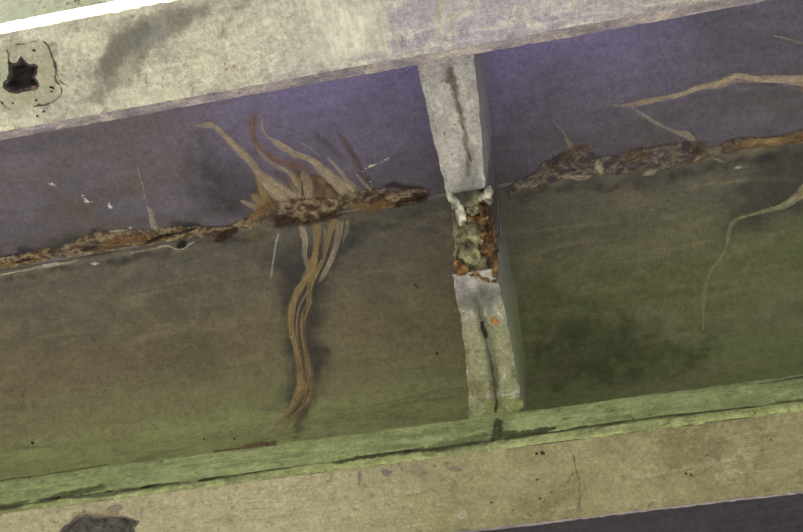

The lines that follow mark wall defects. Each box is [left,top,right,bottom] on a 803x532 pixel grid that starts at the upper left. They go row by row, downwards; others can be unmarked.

spalling [1,57,54,117]
corrosion [210,125,355,207]